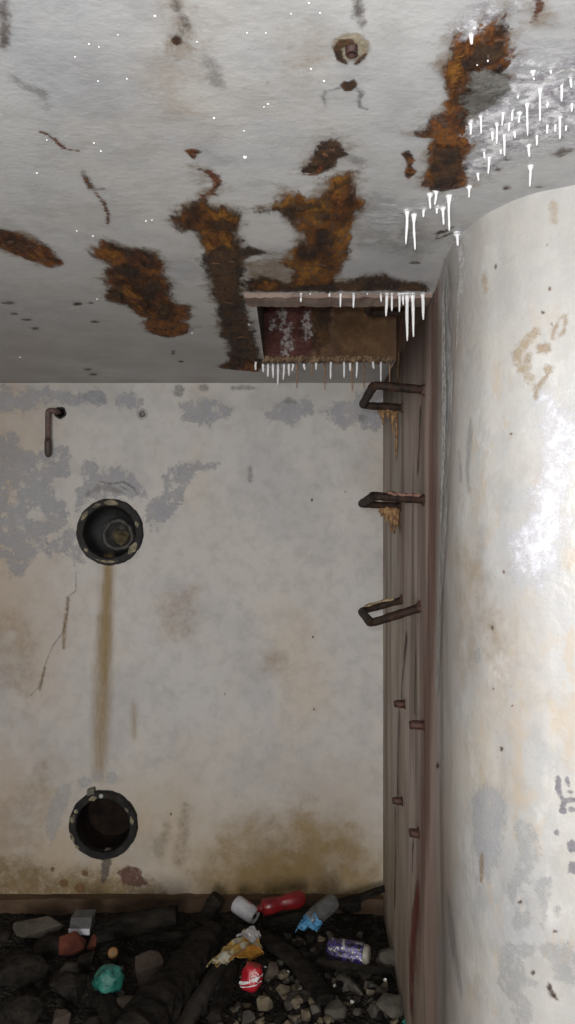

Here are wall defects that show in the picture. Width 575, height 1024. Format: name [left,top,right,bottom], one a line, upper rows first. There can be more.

spalling [332,33,369,64]
rust [402,13,519,191]
rust [0,230,63,268]
rust [89,239,193,337]
rust [170,139,437,372]
leakage [328,38,575,694]
peeling [76,461,216,528]
rust [377,405,434,577]
rust [409,829,423,1014]